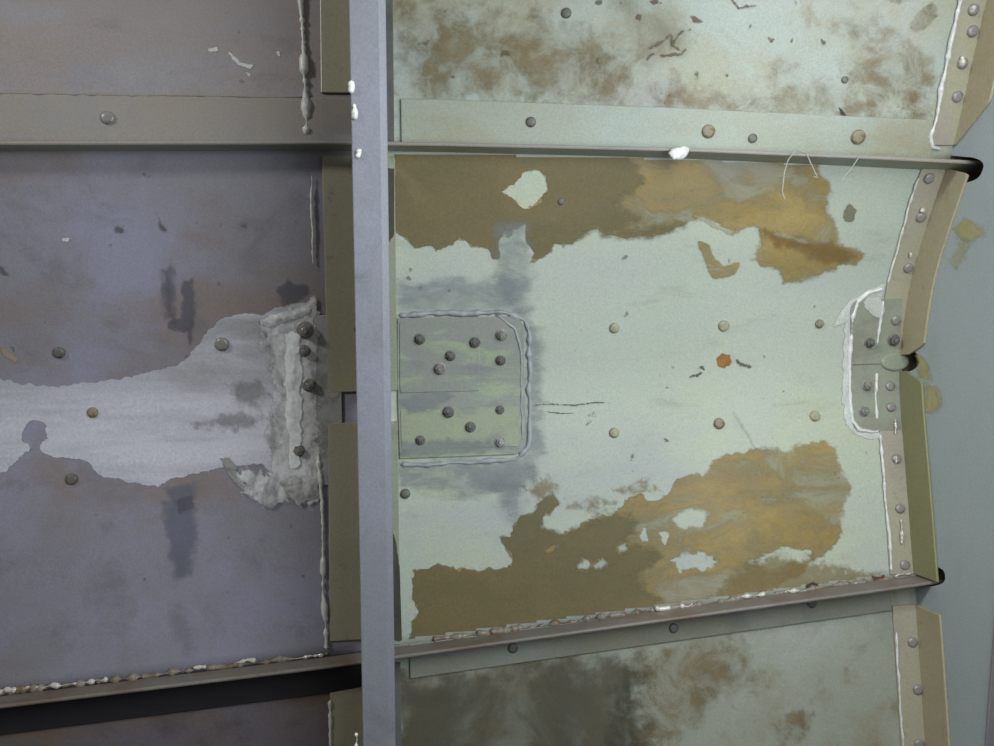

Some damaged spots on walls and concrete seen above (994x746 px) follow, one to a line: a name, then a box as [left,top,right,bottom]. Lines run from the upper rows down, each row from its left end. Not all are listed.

damp [169,280,195,341]
peeling [0,298,316,487]
rust [717,353,732,368]
damp [401,673,506,746]
damp [520,658,673,746]